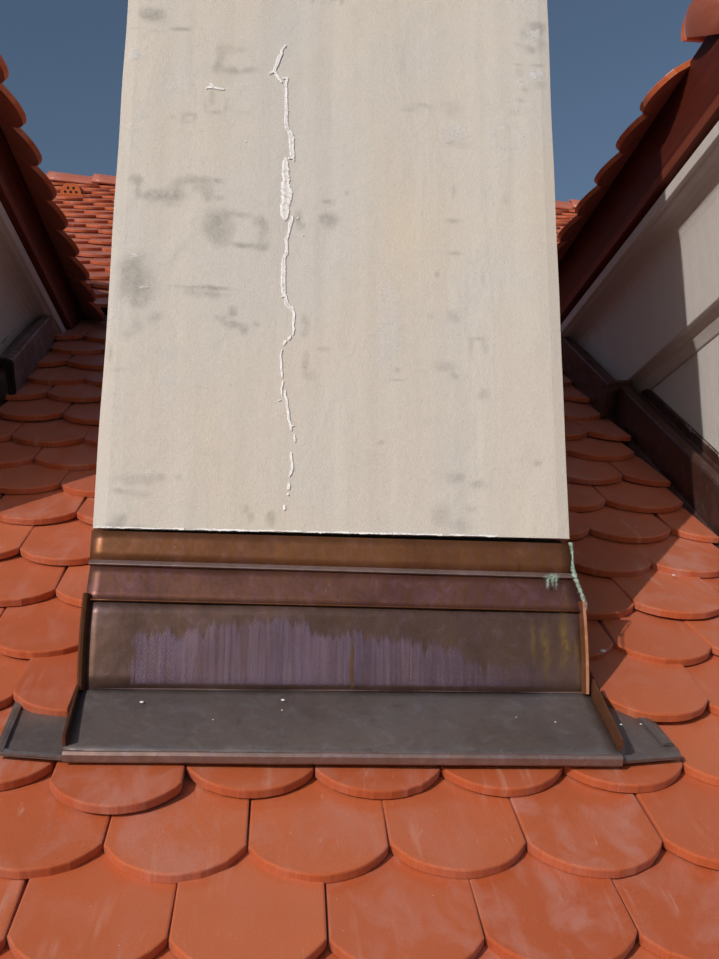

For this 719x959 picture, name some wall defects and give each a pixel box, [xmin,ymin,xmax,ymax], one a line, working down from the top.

crack [269,44,306,510]